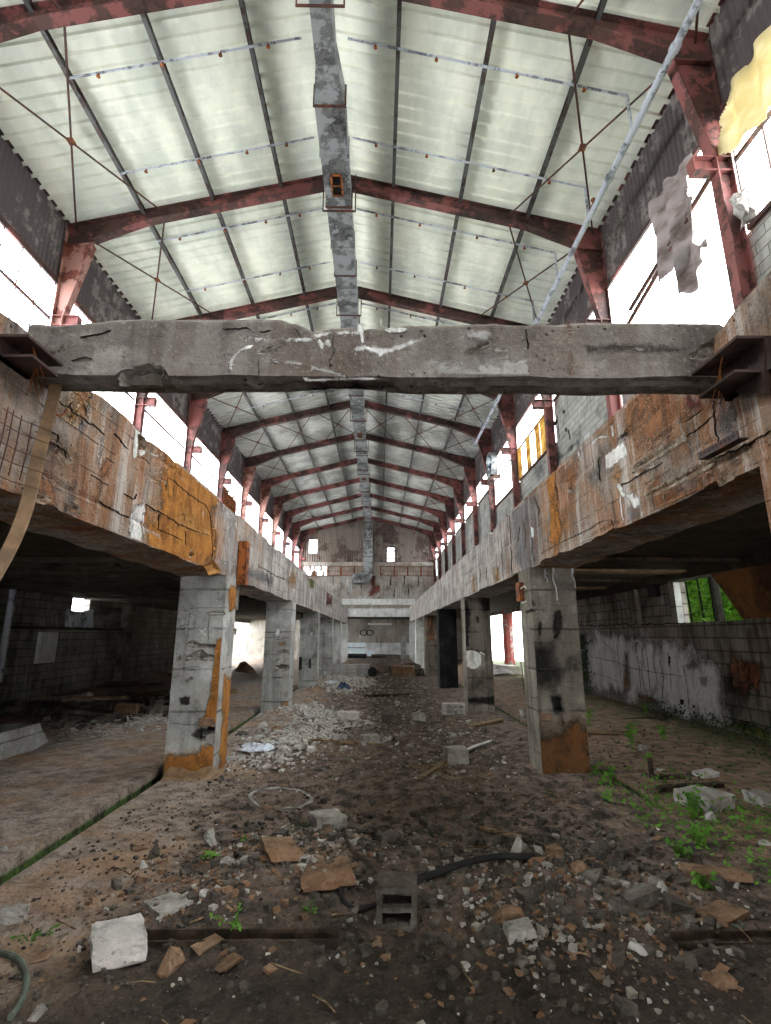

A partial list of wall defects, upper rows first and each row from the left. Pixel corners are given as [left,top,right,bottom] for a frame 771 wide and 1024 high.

spalling [118,362,164,390]
water stain [288,324,414,356]
spalling [0,407,73,505]
crack [35,400,213,557]
corrosion [143,454,219,566]
corrosion [546,463,578,557]
crack [597,458,663,486]
corrosion [649,470,711,510]
crack [681,401,770,459]
corrosion [163,637,231,775]
corrosion [540,718,591,774]
peeling [585,631,723,722]